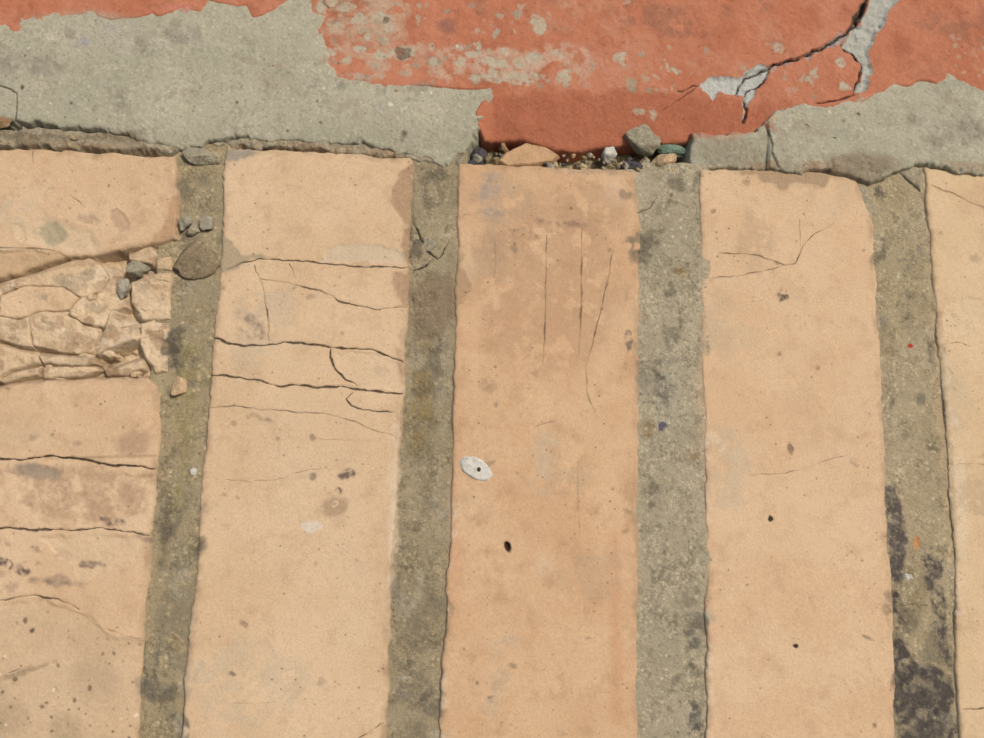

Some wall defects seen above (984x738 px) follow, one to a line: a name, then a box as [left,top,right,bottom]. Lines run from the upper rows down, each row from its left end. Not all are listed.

peeling [313,0,440,74]
peeling [529,12,548,37]
crack [0,85,18,122]
peeling [454,40,585,88]
peeling [612,50,660,122]
crack [735,7,863,168]
peeling [833,53,853,92]
crack [714,219,831,278]
crack [209,223,449,441]
crack [0,454,155,470]
crack [0,526,150,536]
crack [0,594,80,610]